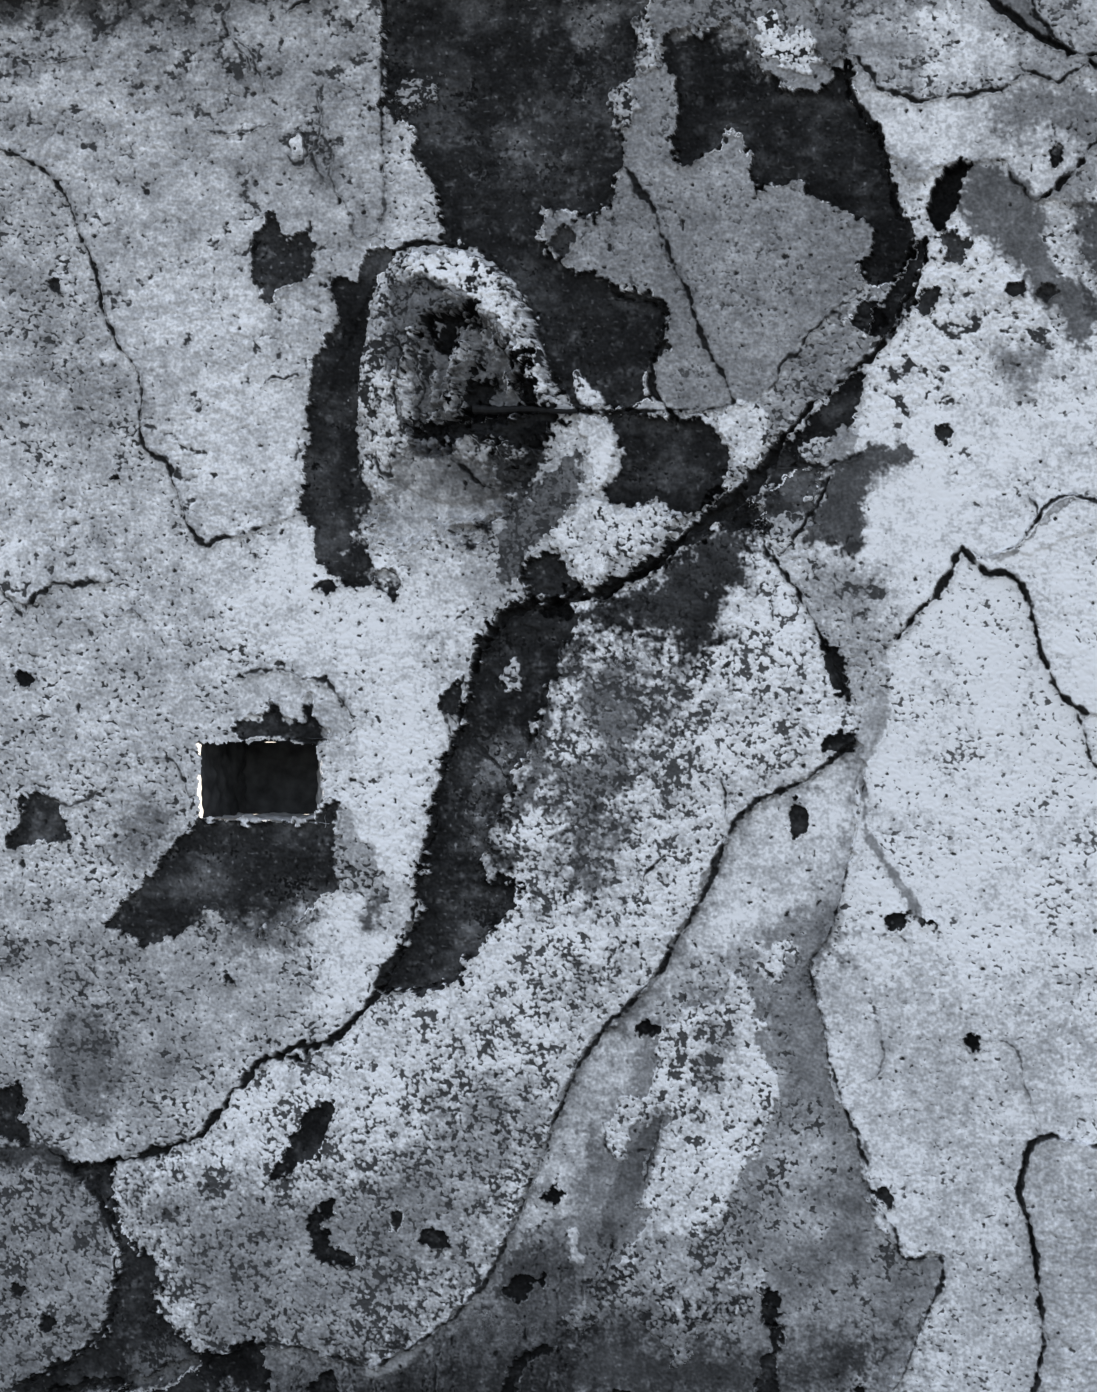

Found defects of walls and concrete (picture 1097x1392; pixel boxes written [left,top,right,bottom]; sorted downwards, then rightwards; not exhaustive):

crack [0,147,296,561]
spalling [249,210,318,307]
spalling [293,243,404,604]
spalling [373,0,991,1001]
crack [839,0,1097,224]
crack [895,487,1097,770]
spalling [10,1157,290,1392]
spalling [104,797,348,951]
crack [0,238,947,1392]
water stain [247,1031,944,1392]
flaking render [467,689,947,1392]
crack [981,1039,1097,1392]